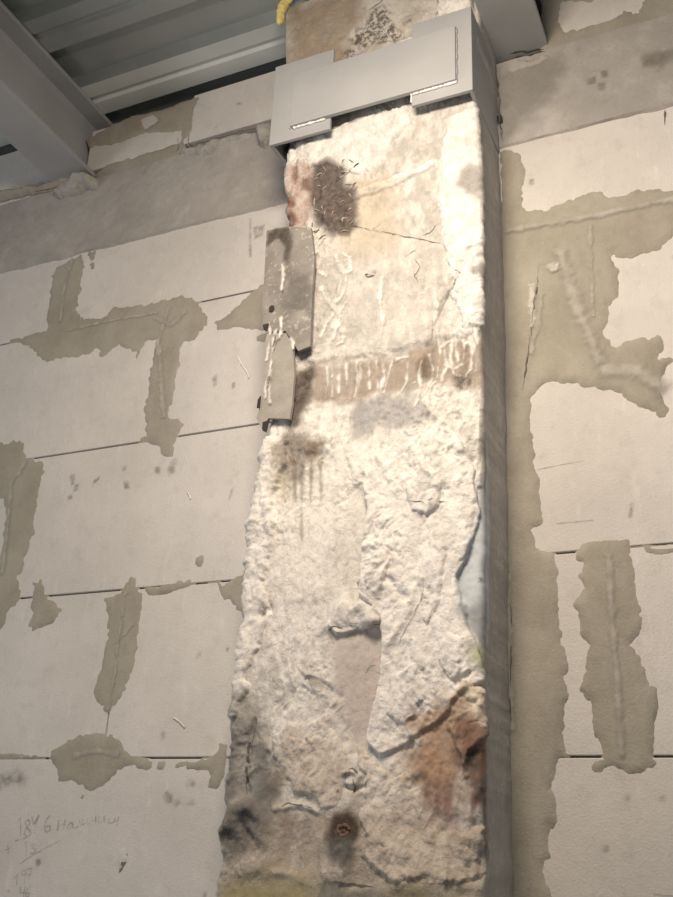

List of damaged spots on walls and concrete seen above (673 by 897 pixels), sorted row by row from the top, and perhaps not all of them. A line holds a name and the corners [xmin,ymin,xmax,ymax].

rust [329,813,358,860]
rust [416,708,489,860]